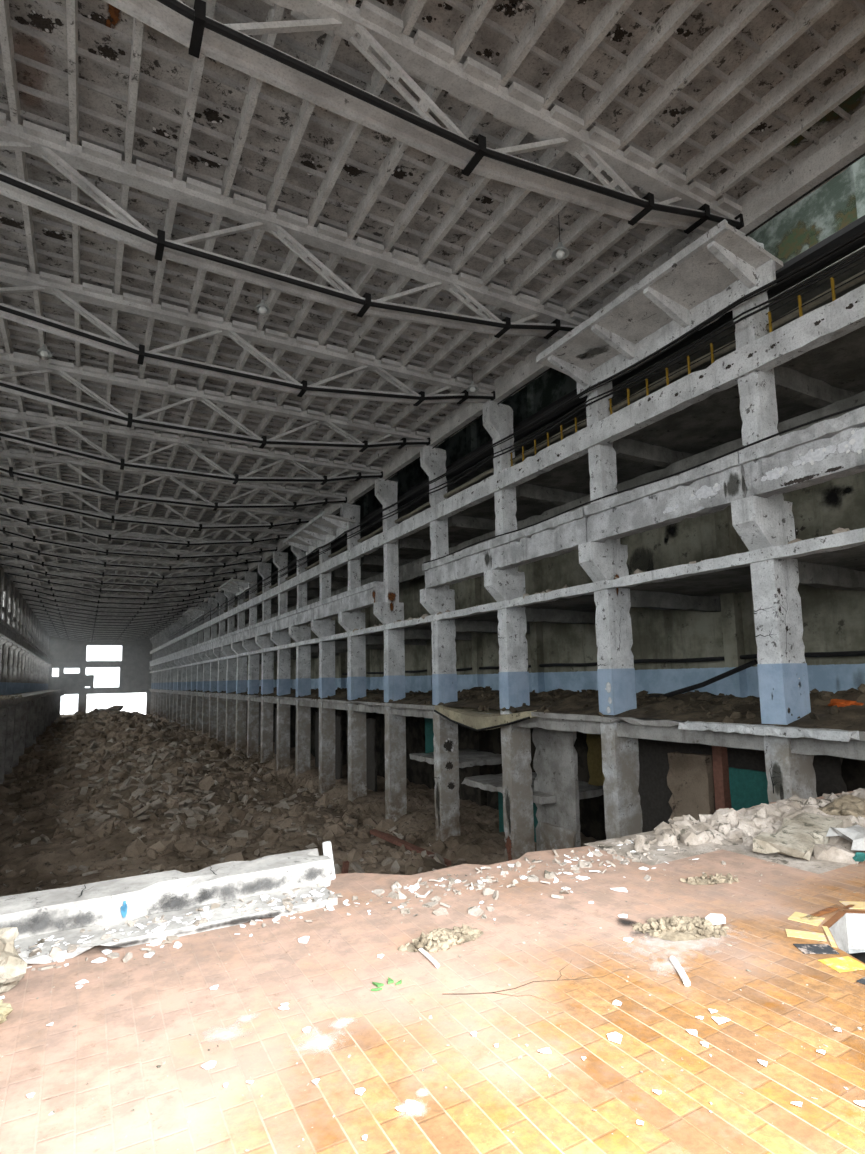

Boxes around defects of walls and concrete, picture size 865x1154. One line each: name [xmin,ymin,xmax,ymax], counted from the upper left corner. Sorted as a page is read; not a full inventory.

peeling [493,0,526,17]
peeling [15,10,64,33]
peeling [82,12,113,25]
corrosion [105,3,121,36]
peeling [605,9,642,42]
peeling [88,45,125,61]
peeling [194,108,230,123]
peeling [144,127,178,144]
peeling [189,151,228,168]